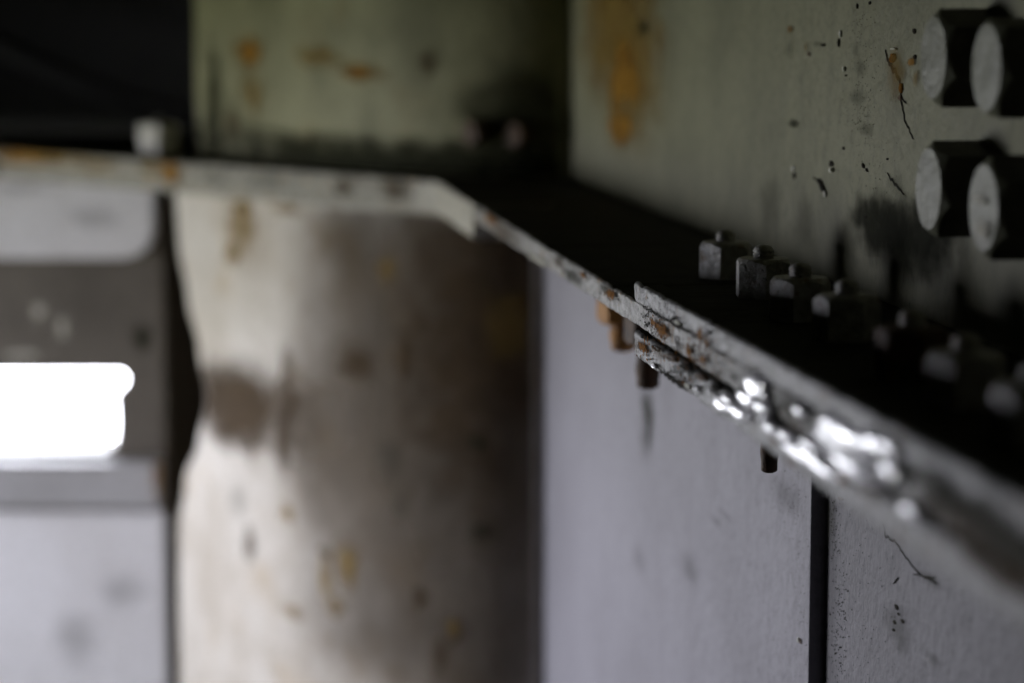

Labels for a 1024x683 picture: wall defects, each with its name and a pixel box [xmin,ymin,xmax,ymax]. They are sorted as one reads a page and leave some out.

crack [885,48,913,139]
corrosion [635,297,752,397]
crack [884,532,937,585]